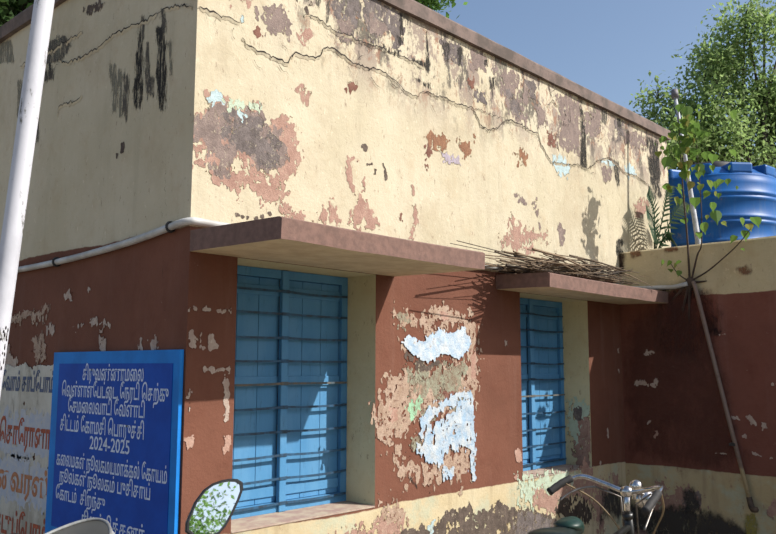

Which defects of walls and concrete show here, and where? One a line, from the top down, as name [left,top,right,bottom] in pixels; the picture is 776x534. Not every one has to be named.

peeling [230,0,313,46]
spalling [331,0,406,52]
damp [44,35,71,81]
damp [108,10,172,121]
crack [43,3,647,185]
peeling [439,38,650,184]
peeling [192,89,388,231]
peeling [424,130,476,171]
peeling [498,193,566,255]
peeling [202,365,231,423]
spalling [328,396,620,534]
damp [600,486,747,534]